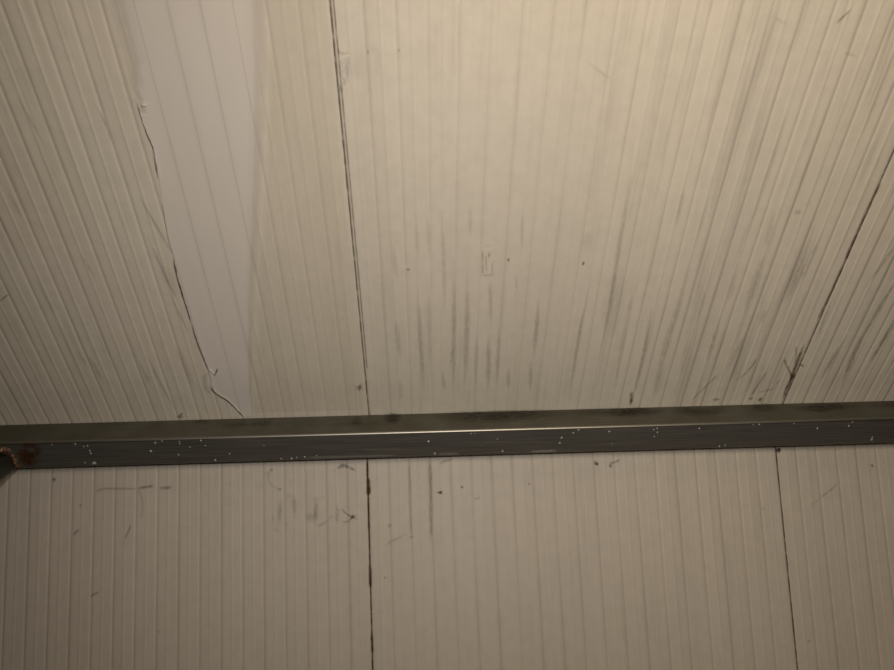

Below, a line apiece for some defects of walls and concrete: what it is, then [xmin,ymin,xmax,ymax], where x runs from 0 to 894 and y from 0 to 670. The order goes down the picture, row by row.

peeling [120,0,258,417]